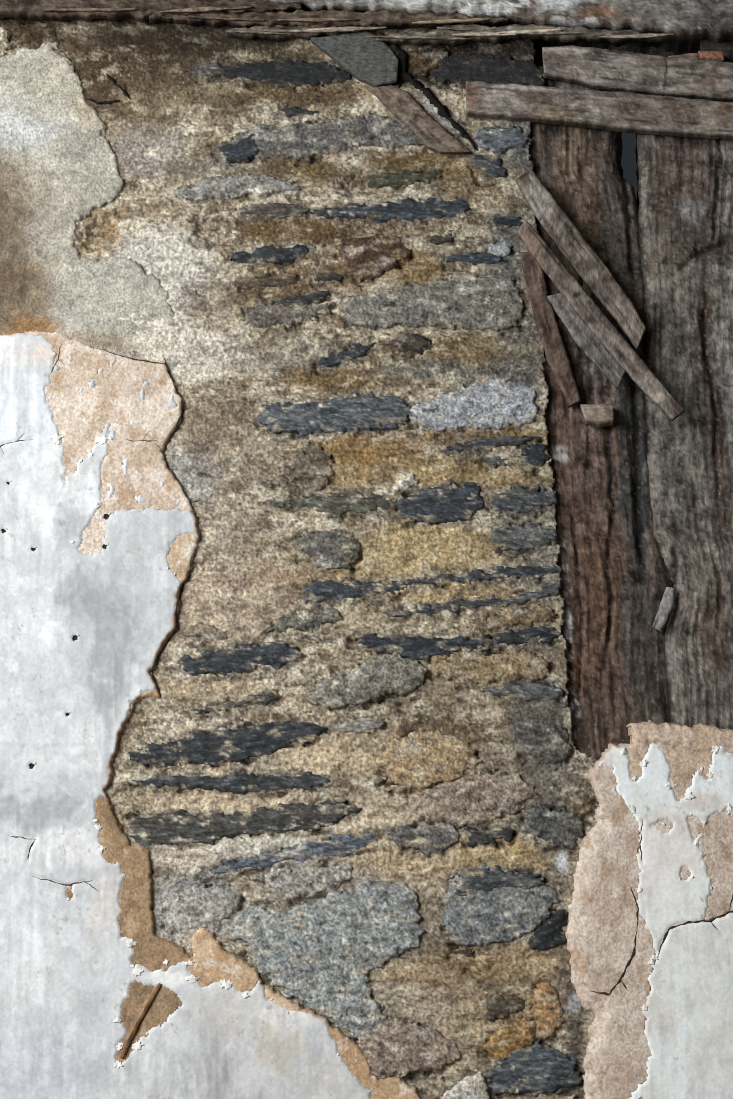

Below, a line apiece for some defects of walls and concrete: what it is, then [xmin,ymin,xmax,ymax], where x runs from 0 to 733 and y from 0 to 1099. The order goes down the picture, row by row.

flaking render [167,534,199,584]
flaking render [127,689,161,720]
flaking render [622,721,733,801]
flaking render [679,867,694,880]
flaking render [687,804,733,921]
flaking render [92,794,305,1068]
flaking render [565,764,673,1099]
crack [591,889,733,995]
flaking render [326,1021,421,1099]